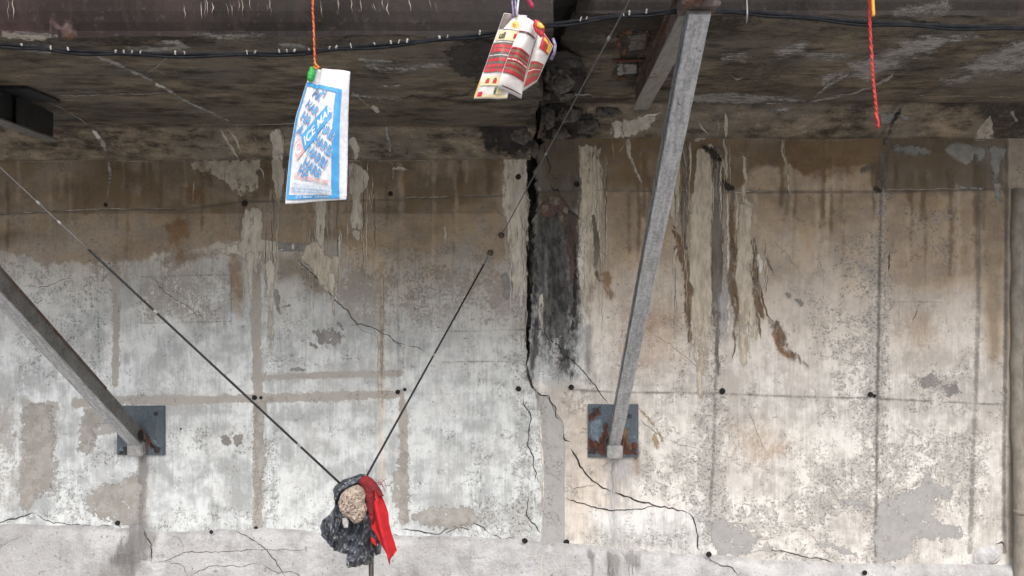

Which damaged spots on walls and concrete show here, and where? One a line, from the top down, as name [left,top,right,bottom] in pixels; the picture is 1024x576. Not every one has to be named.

leakage [2,1,70,54]
spalling [444,39,493,83]
spalling [478,50,622,160]
crack [550,0,575,52]
leakage [300,127,447,398]
leakage [667,32,978,399]
leakage [470,113,659,514]
crack [393,80,833,574]
rust [587,406,608,456]
rust [621,428,638,455]
crack [115,529,306,576]
peeling [834,464,965,564]